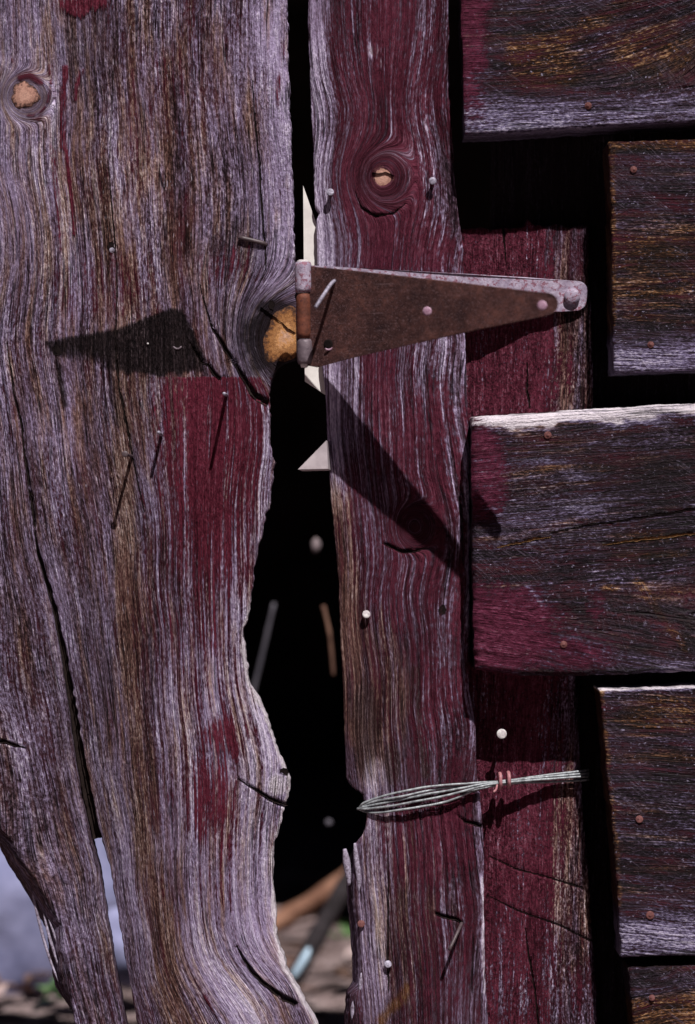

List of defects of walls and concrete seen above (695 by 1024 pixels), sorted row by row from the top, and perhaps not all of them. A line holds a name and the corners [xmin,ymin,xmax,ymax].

crack [189,284,269,406]
crack [382,542,426,553]
crack [498,508,695,548]
crack [7,343,102,839]
crack [238,778,288,806]
crack [491,856,582,888]
crack [231,939,295,1006]
crack [488,895,594,1024]